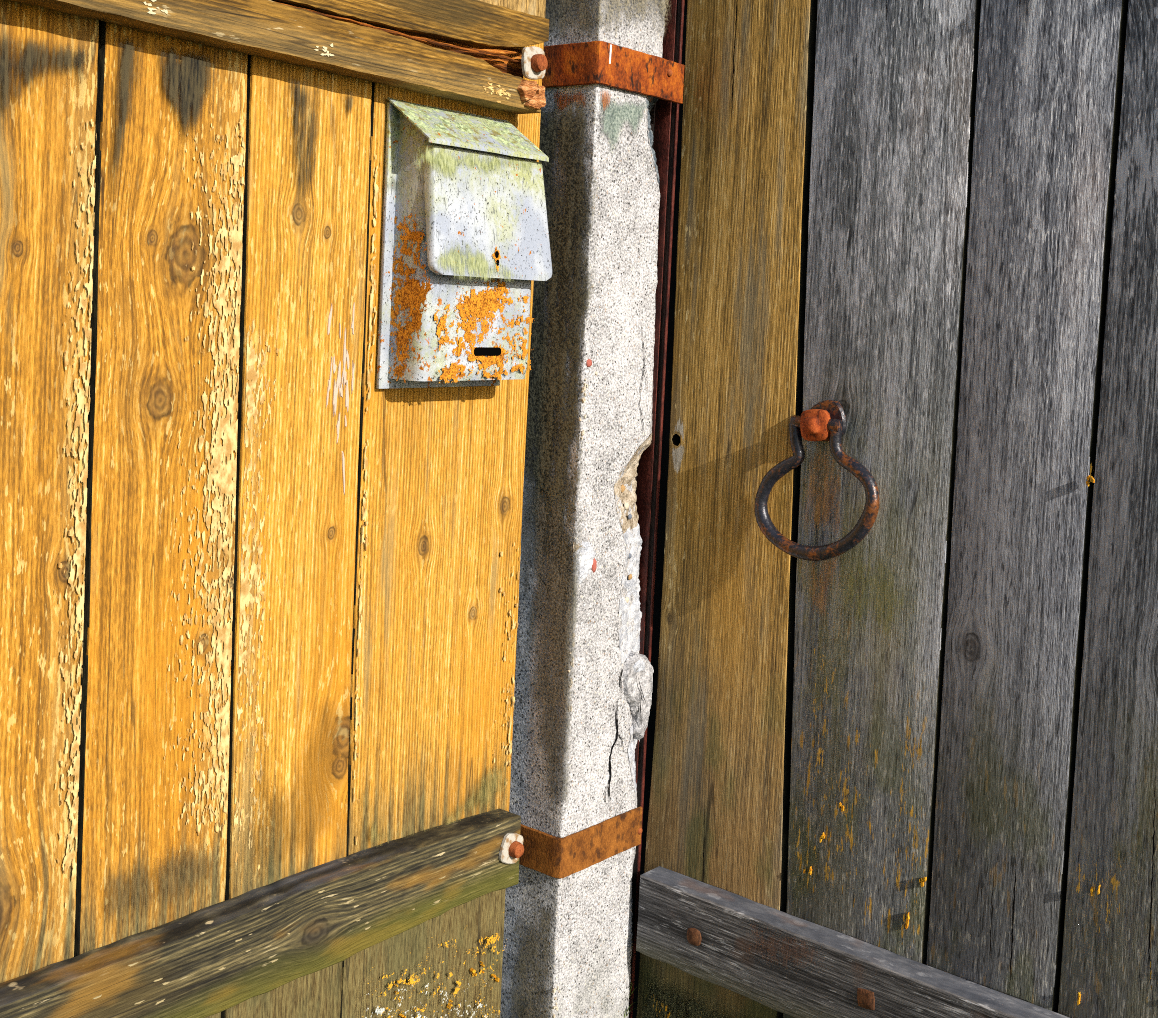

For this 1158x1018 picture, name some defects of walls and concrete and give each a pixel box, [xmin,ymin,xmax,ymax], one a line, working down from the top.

water stain [0,35,84,109]
water stain [115,40,135,168]
water stain [161,49,211,132]
crack [274,1,524,78]
water stain [426,150,498,175]
water stain [602,103,643,145]
rust [388,213,534,383]
peeling [164,110,279,862]
water stain [519,98,597,806]
spalling [614,433,652,663]
crack [605,666,624,810]
water stain [512,912,551,1018]